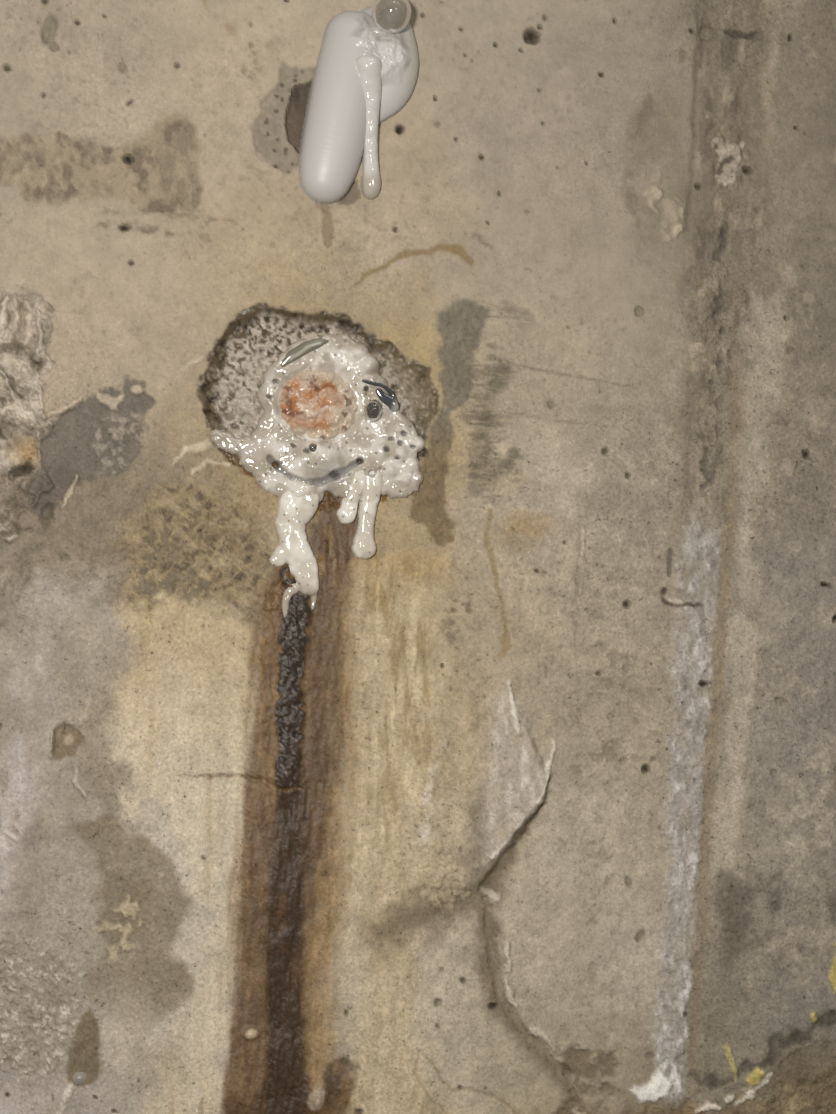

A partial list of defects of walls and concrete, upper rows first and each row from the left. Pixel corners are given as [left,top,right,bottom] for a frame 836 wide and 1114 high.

peeling [0,280,157,545]
damp [0,551,245,1114]
rust [218,492,372,1114]
damp [146,0,573,1114]
crack [478,884,627,1114]
damp [579,280,836,1114]